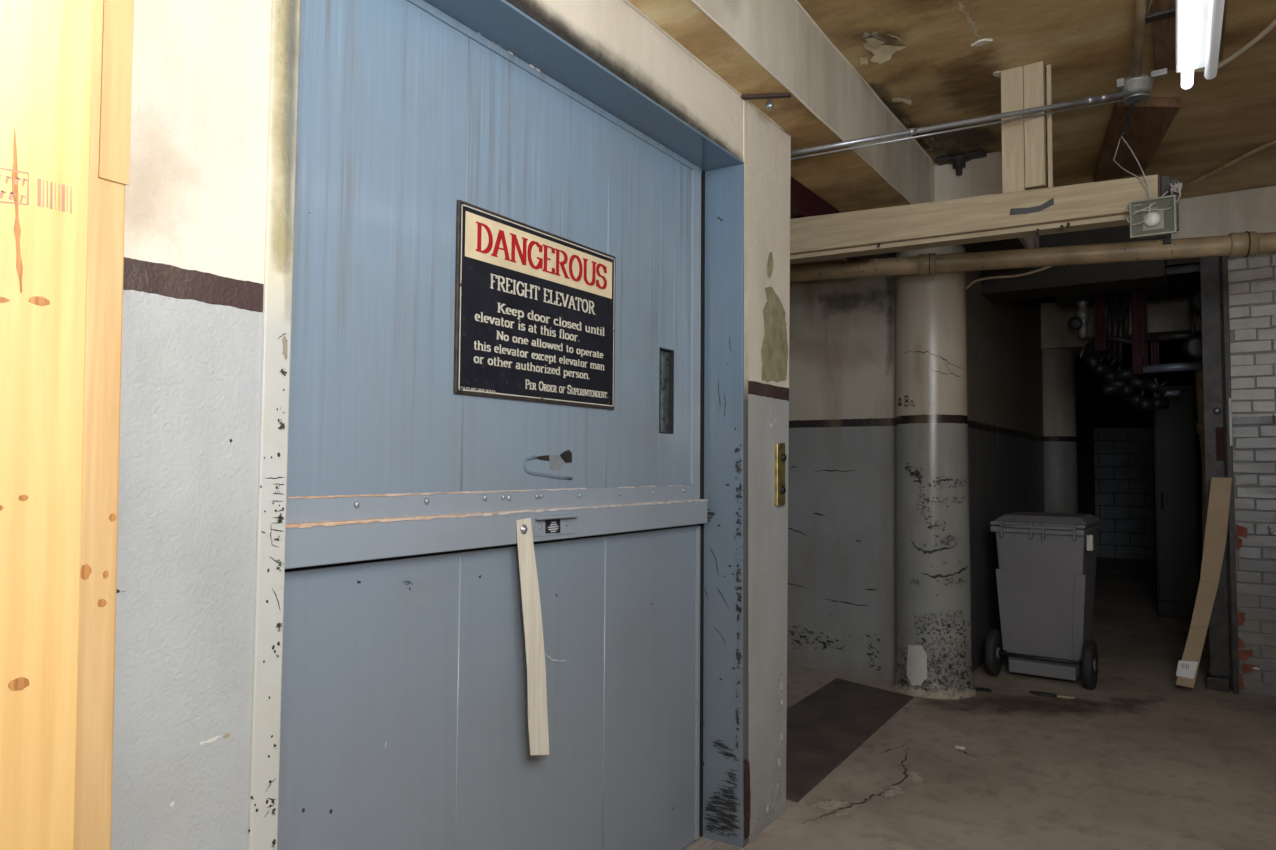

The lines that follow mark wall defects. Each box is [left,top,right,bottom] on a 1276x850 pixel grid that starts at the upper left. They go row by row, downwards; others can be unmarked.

peeling [860,32,907,65]
crack [957,1,1001,79]
damp [275,0,295,264]
peeling [760,252,788,382]
peeling [789,625,844,650]
peeling [893,632,976,699]
crack [802,744,909,824]